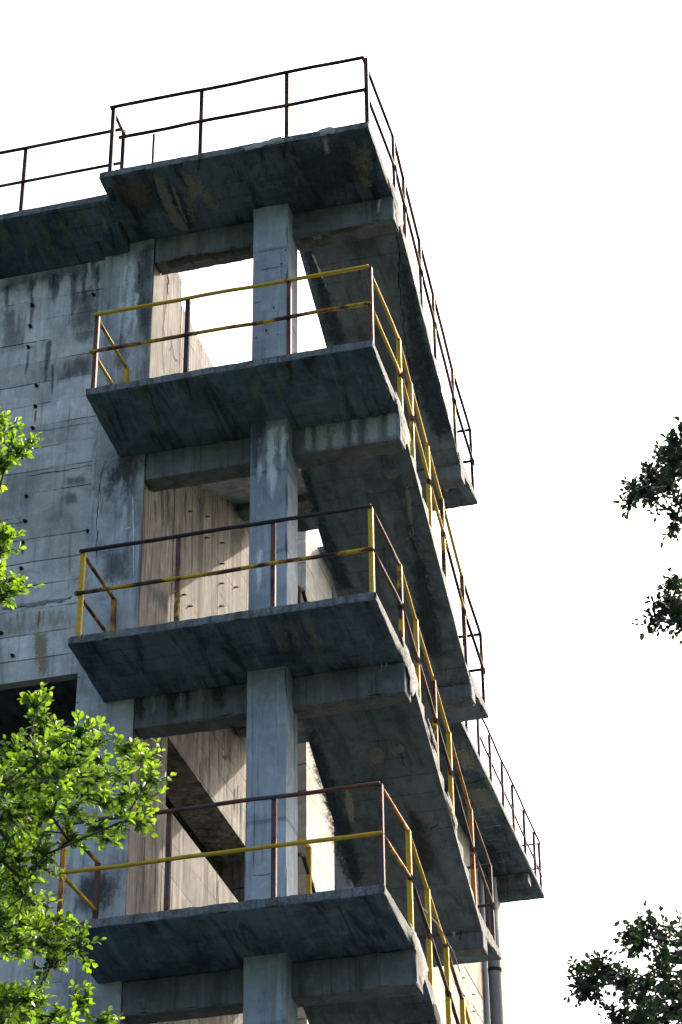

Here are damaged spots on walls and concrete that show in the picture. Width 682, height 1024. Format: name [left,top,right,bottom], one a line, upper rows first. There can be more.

damp [6,263,99,387]
damp [112,246,153,339]
damp [302,732,364,886]
damp [405,806,433,872]